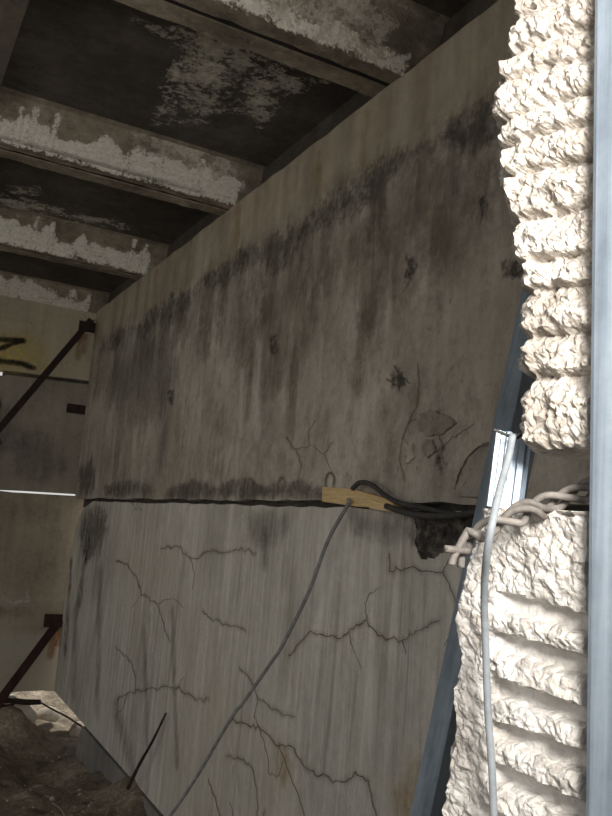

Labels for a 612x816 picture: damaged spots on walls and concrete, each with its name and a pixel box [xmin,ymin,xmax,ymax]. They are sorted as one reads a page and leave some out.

leakage [147,25,328,128]
leakage [215,0,411,77]
leakage [0,106,245,206]
leakage [0,186,151,275]
leakage [0,275,92,312]
spalling [411,510,473,560]
crack [116,546,252,641]
crack [288,588,439,667]
crack [389,553,456,602]
crack [114,648,208,717]
crack [226,668,376,816]